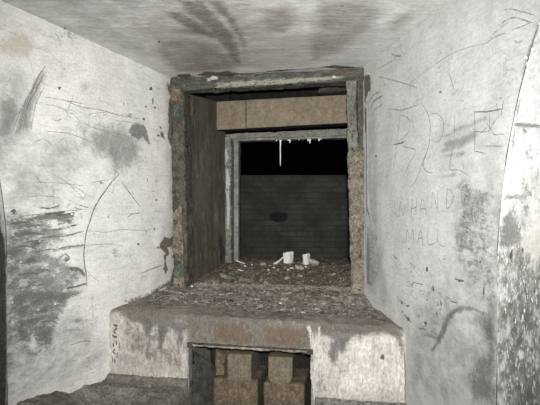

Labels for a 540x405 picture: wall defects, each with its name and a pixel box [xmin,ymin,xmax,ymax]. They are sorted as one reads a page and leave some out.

spalling [125,236,174,304]
leakage [123,307,397,349]